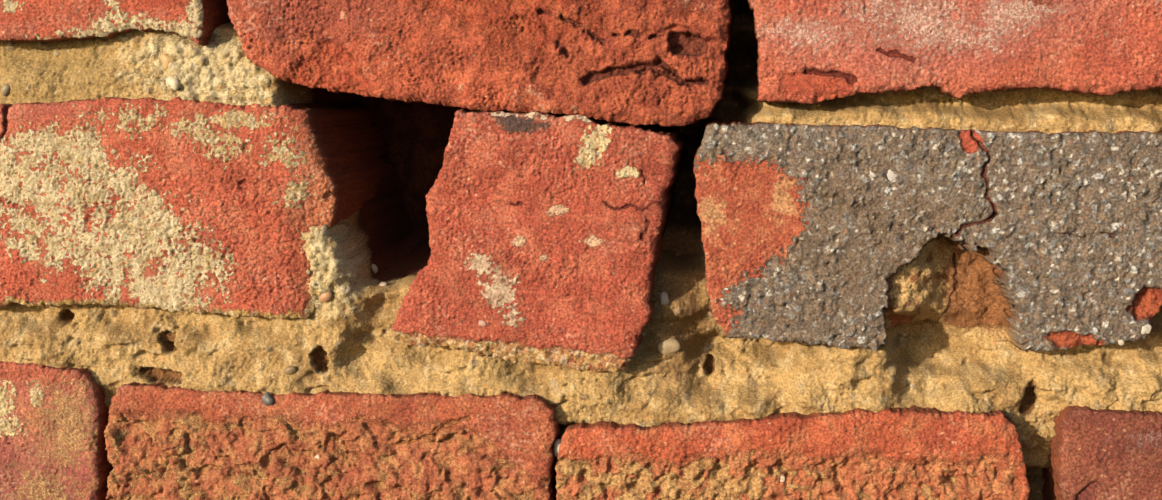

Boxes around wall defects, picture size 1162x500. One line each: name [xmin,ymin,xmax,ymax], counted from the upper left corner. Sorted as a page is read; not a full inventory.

damp [757,0,1073,58]
spalling [883,235,1015,329]
spalling [104,408,1022,500]